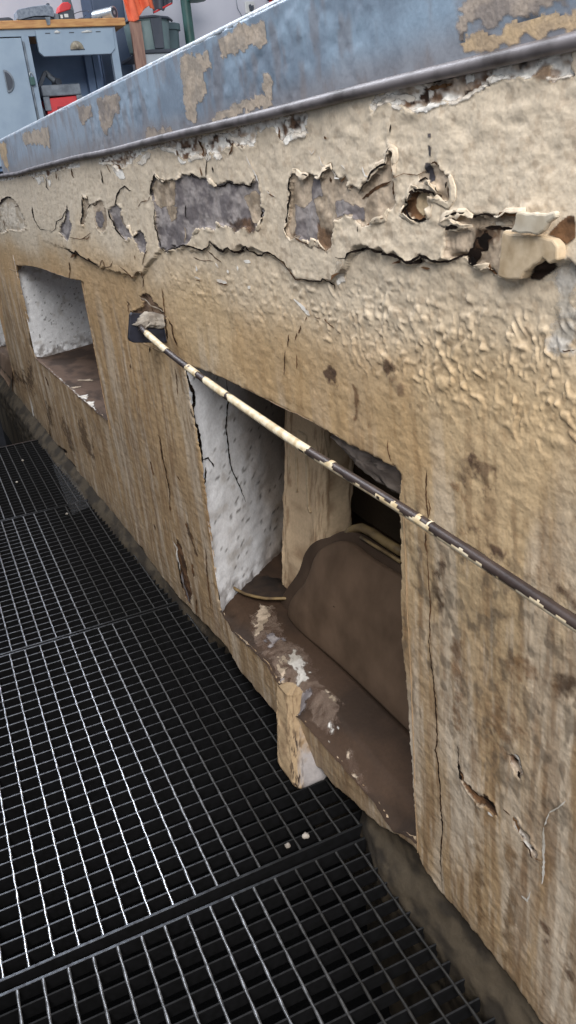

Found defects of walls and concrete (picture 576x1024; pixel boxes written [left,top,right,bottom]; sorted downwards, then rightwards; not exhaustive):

peeling [180,20,267,123]
flaking render [370,52,575,111]
flaking render [0,73,308,253]
flaking render [283,125,575,276]
crack [64,232,471,369]
flaking render [531,261,558,280]
crack [150,371,246,528]
flaking render [245,605,312,715]
crack [424,471,443,890]
hole [457,746,542,861]